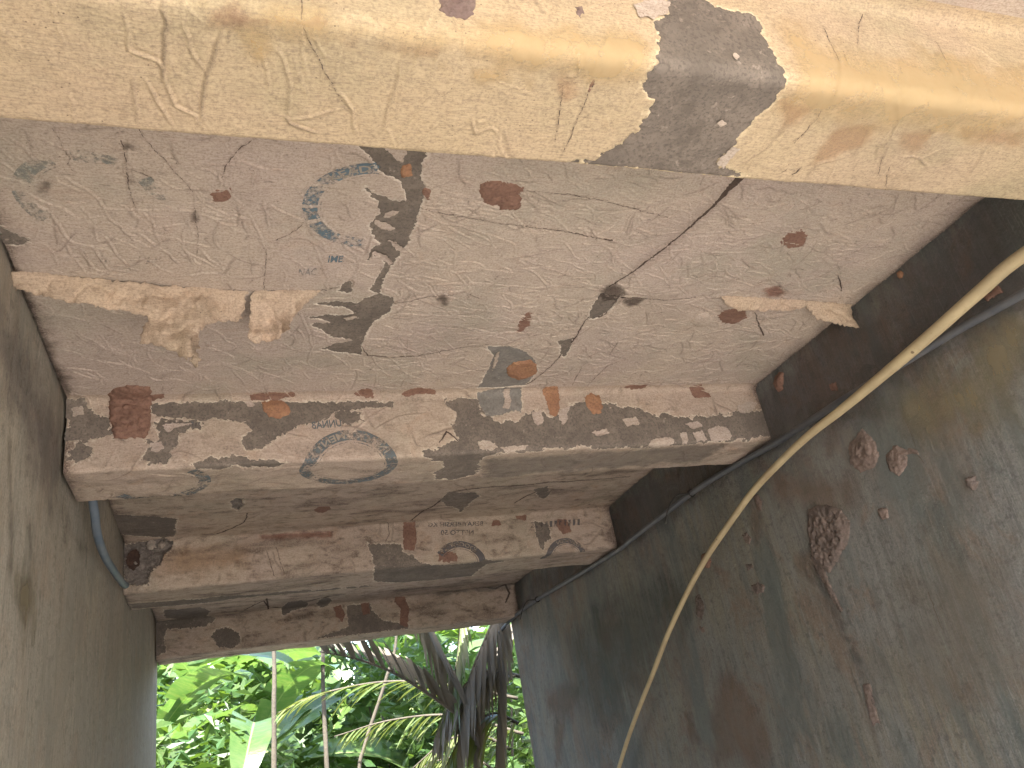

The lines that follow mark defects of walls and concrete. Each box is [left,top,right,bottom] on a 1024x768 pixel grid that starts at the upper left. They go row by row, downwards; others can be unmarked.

peeling [571,0,787,177]
peeling [309,146,427,355]
crack [525,178,744,385]
peeling [64,397,114,463]
peeling [141,399,394,470]
peeling [422,346,770,480]
spalling [113,514,177,586]
peeling [127,543,504,656]